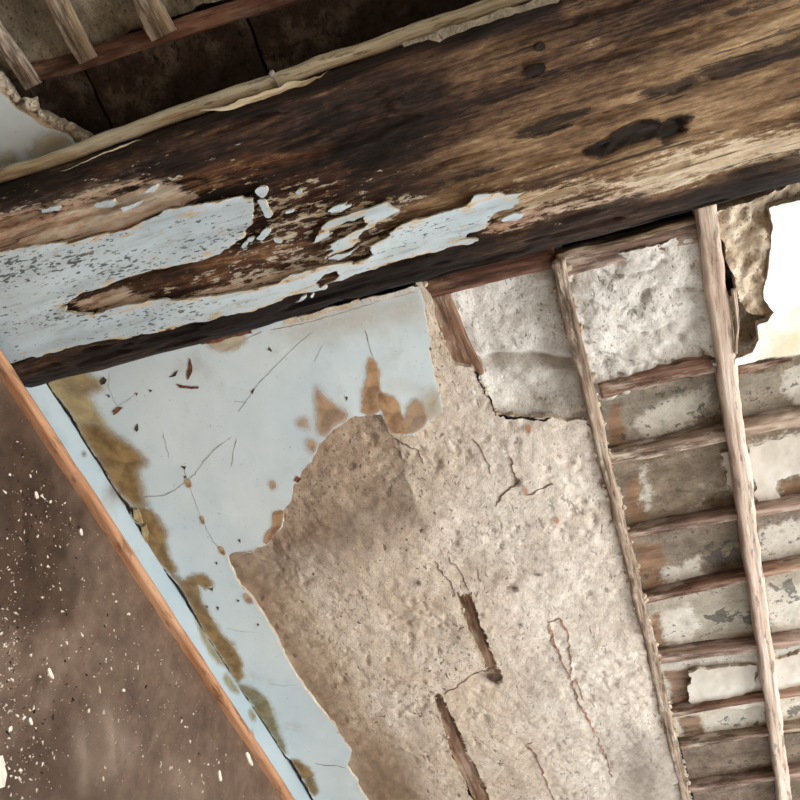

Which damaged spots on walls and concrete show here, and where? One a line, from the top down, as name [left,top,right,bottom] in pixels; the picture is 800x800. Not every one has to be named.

peeling [0,183,525,363]
leakage [315,390,348,436]
leakage [361,358,440,435]
crack [474,371,551,422]
leakage [48,373,286,753]
spalling [201,281,681,800]
crack [435,558,469,591]
crack [445,667,495,695]
peeling [687,662,757,704]
leakage [292,759,318,796]